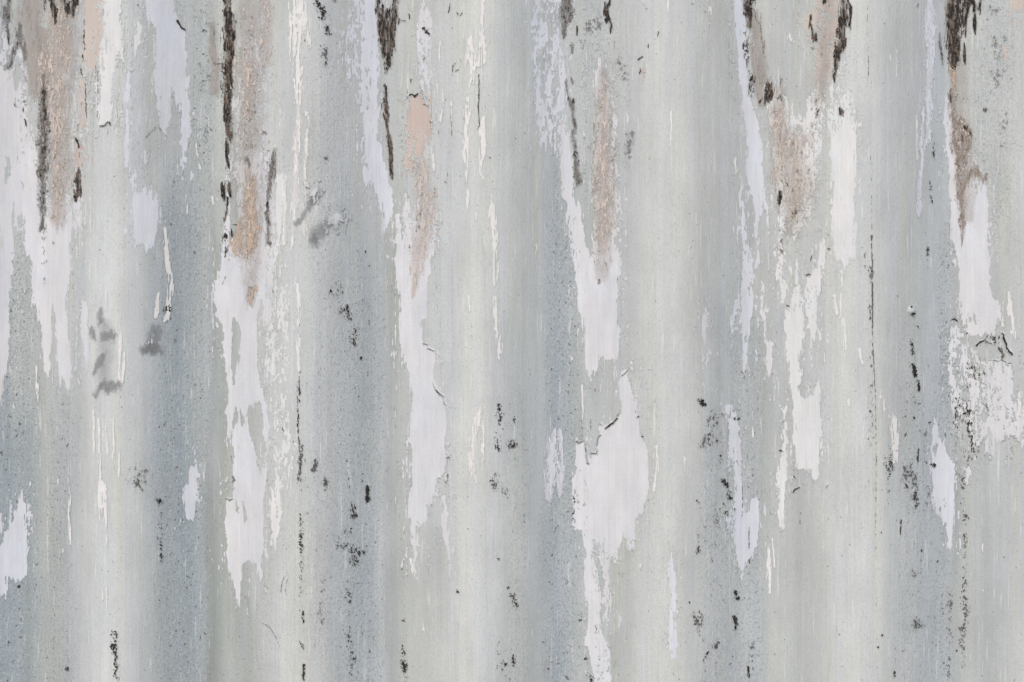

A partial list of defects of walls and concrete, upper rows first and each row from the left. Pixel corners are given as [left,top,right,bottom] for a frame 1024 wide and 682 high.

spalling [110,629,120,679]
peeling [0,0,330,615]
rust [229,169,262,258]
peeling [303,0,460,593]
peeling [524,0,863,682]
peeling [881,91,1024,682]
rust [947,64,988,244]
peeling [986,35,1017,88]